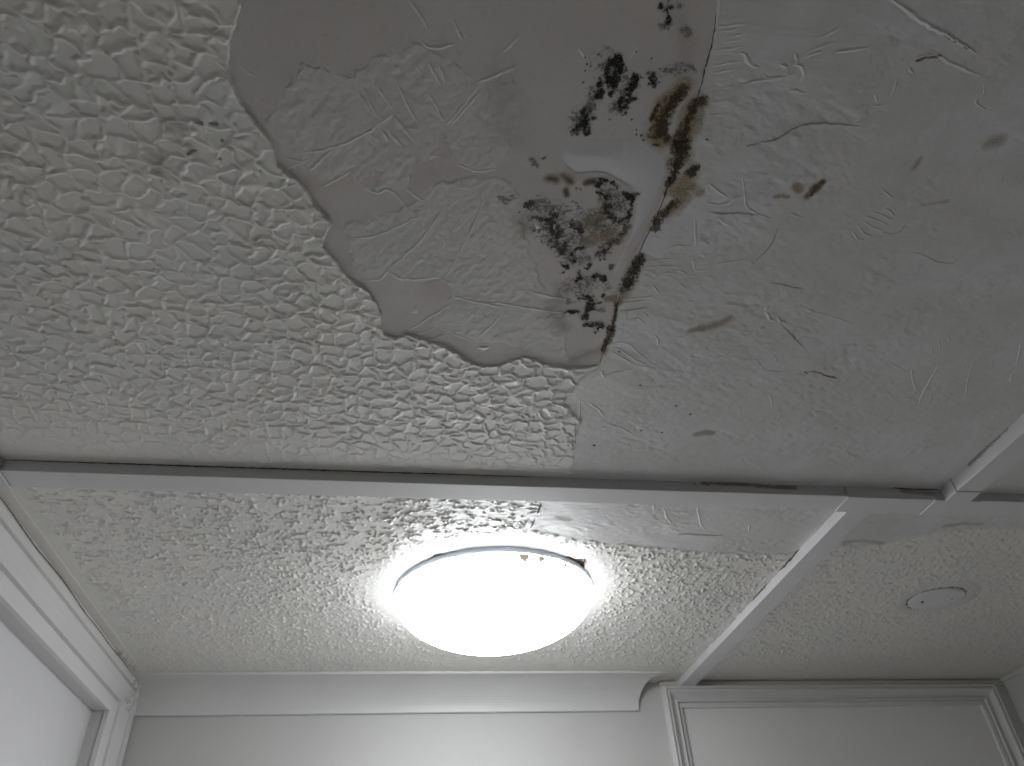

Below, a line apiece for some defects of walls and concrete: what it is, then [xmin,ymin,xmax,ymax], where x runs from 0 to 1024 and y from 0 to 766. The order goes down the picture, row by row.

peeling [228,0,717,367]
damp [523,178,646,334]
damp [569,47,708,233]
crack [638,181,670,257]
damp [658,0,691,37]
crack [690,14,716,119]